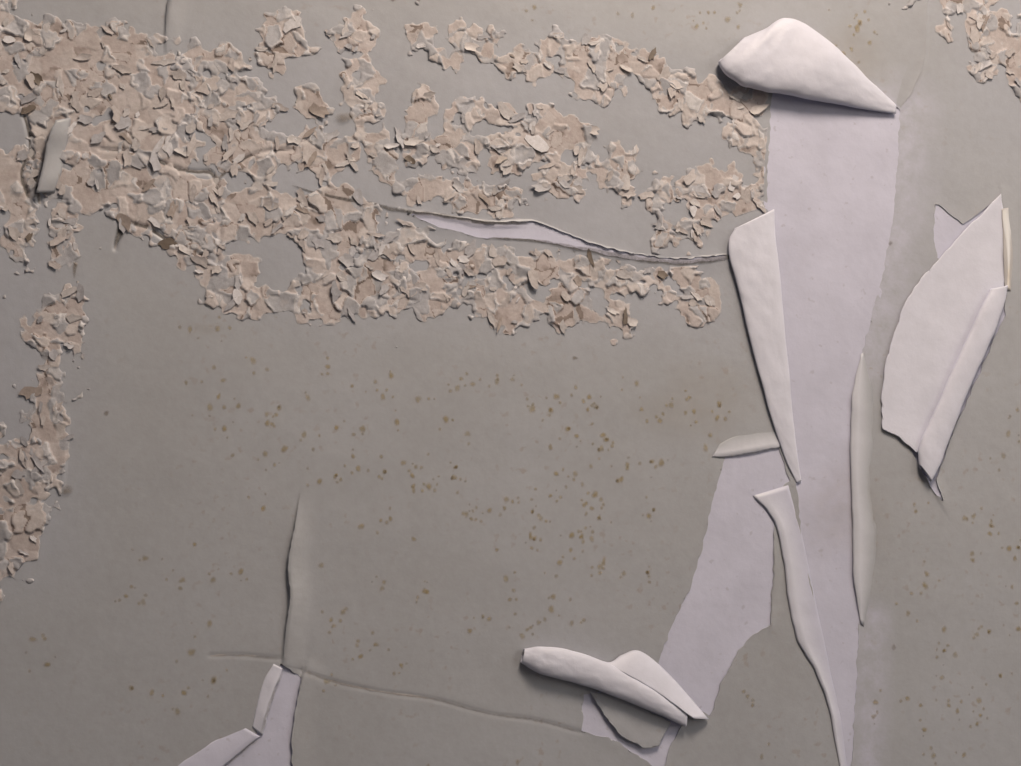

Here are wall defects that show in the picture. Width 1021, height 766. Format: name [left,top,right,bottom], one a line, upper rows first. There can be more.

peeling [0,280,90,603]
peeling [0,0,722,339]
crack [299,187,728,264]
peeling [404,17,900,766]
peeling [881,194,1013,500]
peeling [935,0,1021,102]
peeling [178,493,335,766]